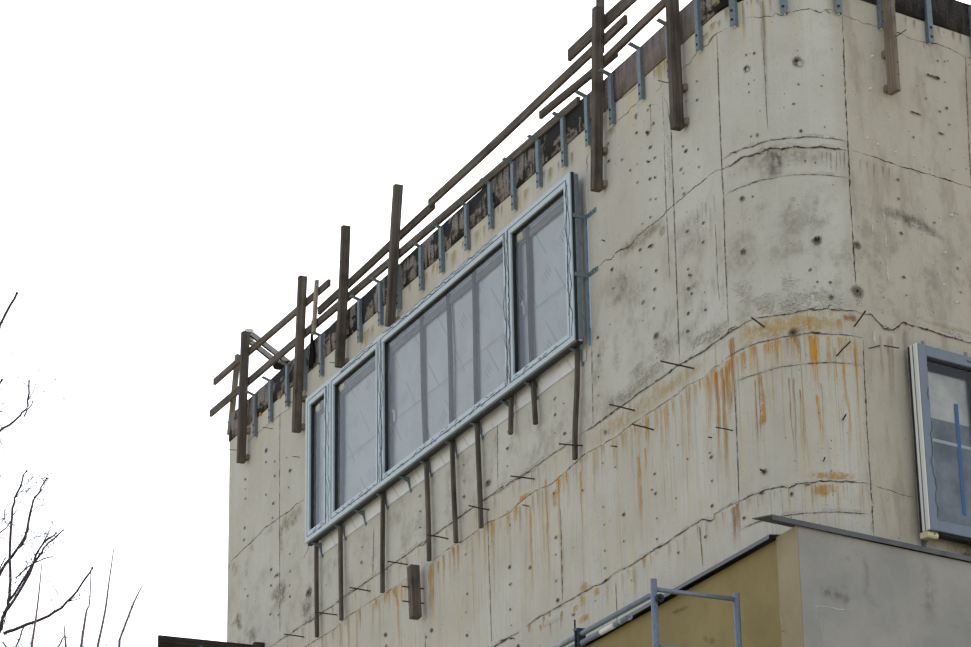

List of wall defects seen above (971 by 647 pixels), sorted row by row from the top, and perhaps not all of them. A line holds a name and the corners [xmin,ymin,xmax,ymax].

crack [592,133,971,270]
rust [689,316,858,440]
crack [269,304,912,647]
rust [805,473,848,495]